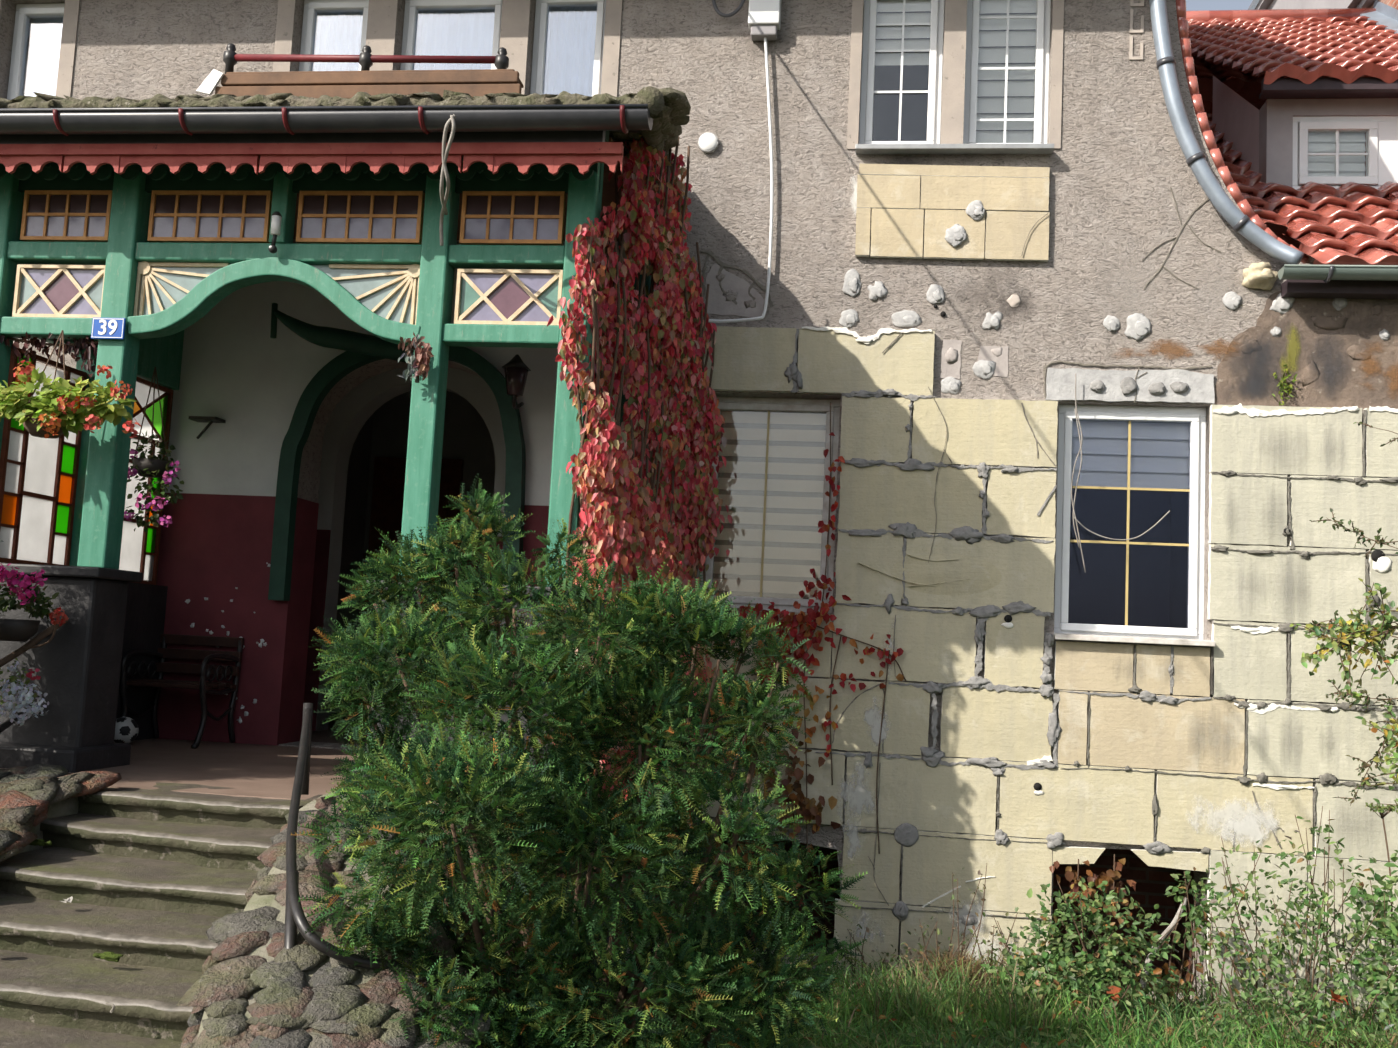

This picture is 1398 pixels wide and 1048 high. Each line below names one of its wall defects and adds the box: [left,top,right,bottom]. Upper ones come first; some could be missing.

crack [1142,187,1221,290]
spalling [784,326,932,393]
peeling [945,346,958,364]
flaking render [1211,291,1398,634]
spalling [815,389,1398,843]
spalling [837,828,959,913]